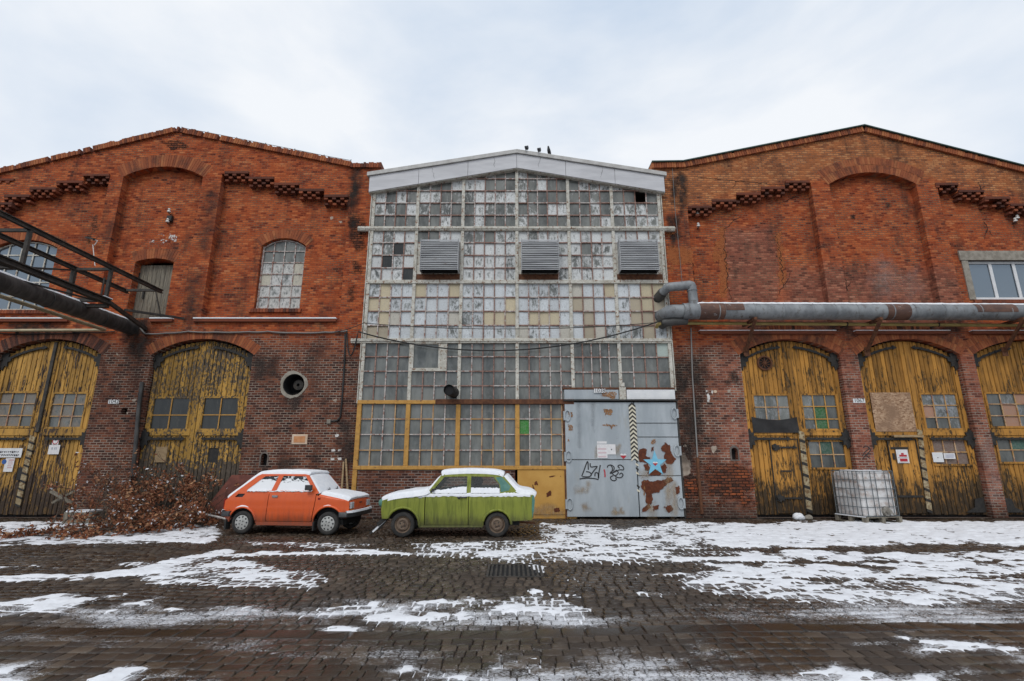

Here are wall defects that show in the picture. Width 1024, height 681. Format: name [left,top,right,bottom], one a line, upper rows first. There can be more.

damp [348,168,360,227]
rust [638,439,680,513]